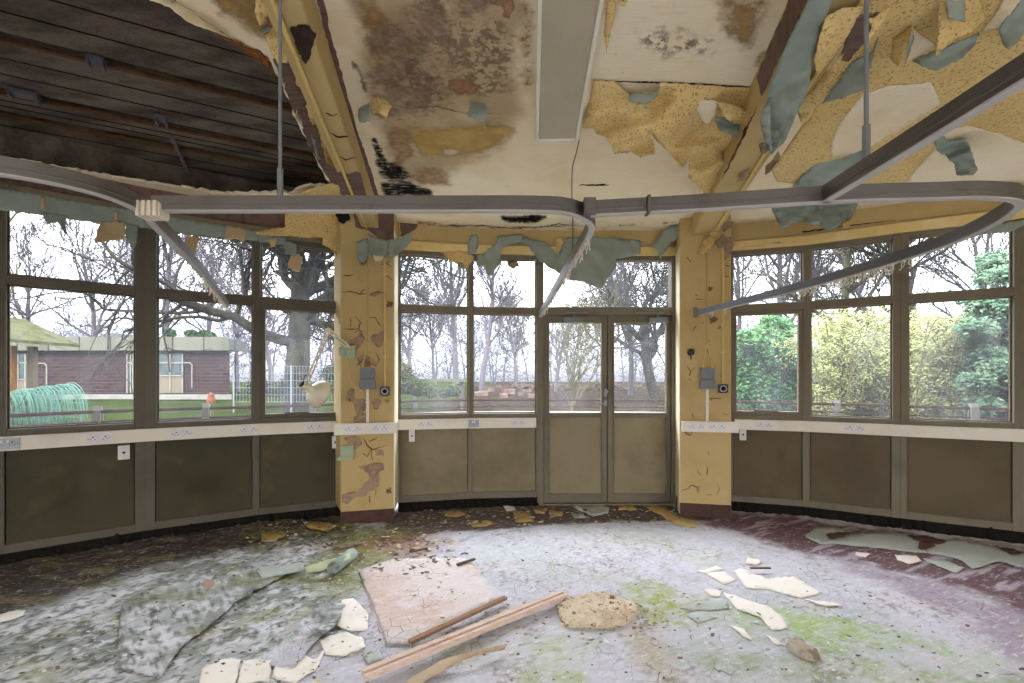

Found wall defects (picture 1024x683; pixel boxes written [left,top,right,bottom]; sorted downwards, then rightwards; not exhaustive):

water stain [352,0,532,116]
peeling [757,0,807,96]
peeling [273,0,378,195]
water stain [372,126,513,195]
crack [343,261,392,366]
peeling [344,436,362,449]
peeling [341,449,391,504]
crack [362,438,383,461]
peeling [895,554,964,573]